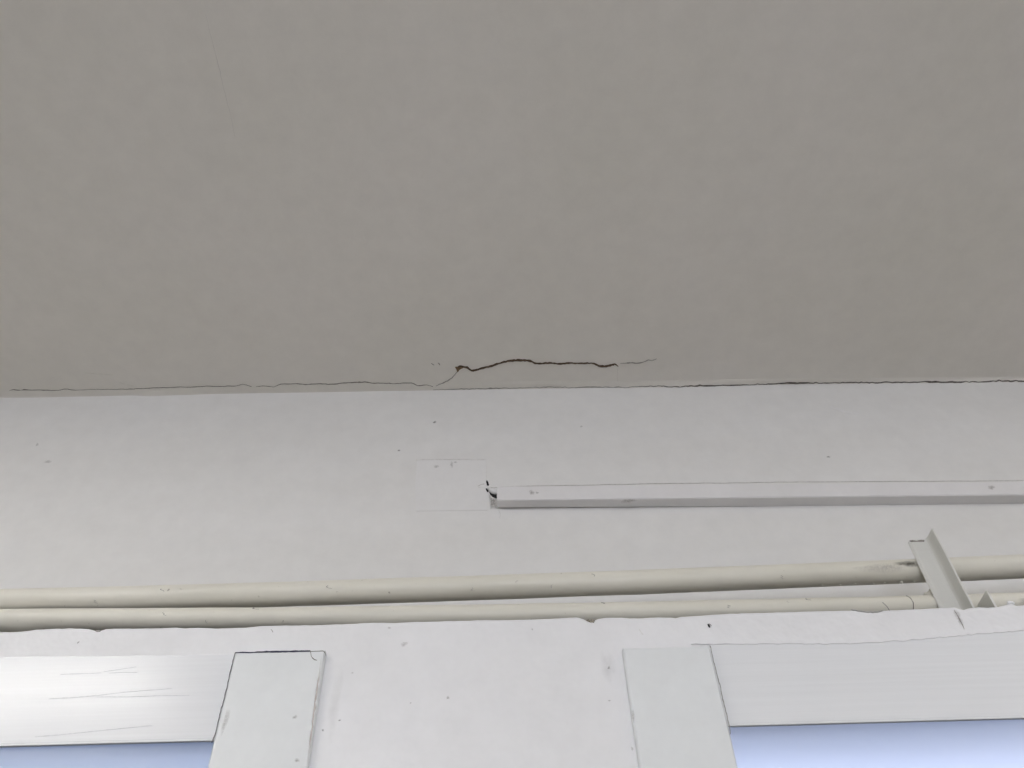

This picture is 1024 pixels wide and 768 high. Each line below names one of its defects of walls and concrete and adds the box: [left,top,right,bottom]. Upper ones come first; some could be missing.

crack [9,359,1024,391]